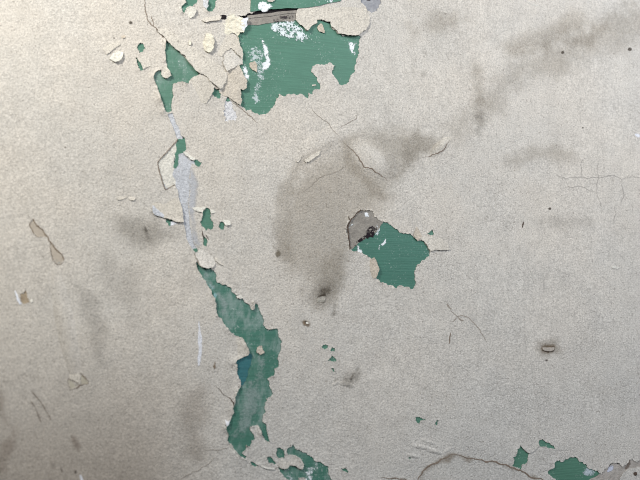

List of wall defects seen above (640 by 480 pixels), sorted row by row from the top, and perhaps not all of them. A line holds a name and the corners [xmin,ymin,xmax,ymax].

crack [303,146,387,192]
peeling [136,0,381,480]
peeling [344,209,450,289]
crack [382,454,543,480]
peeling [513,439,555,469]
peeling [548,457,640,480]